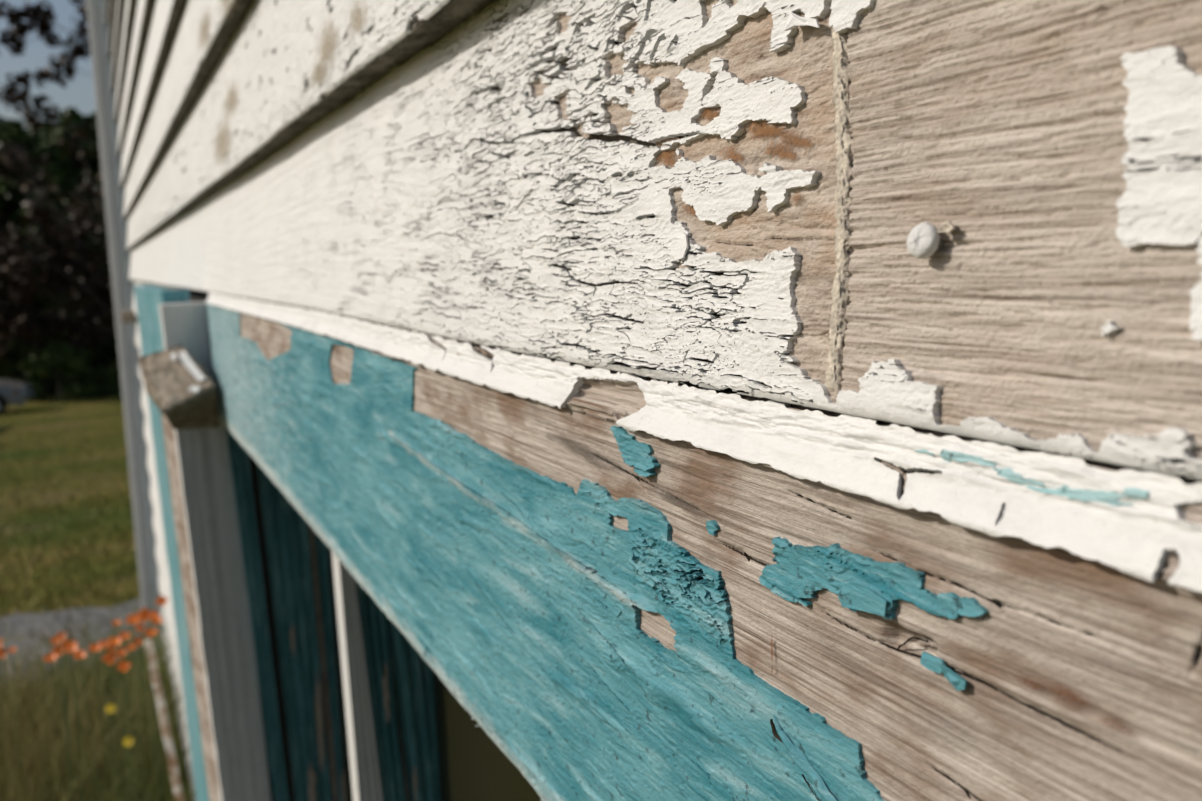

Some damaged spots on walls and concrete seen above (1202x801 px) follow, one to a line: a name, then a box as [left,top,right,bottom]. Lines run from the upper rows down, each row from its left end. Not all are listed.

peeling [467,0,1202,464]
peeling [240,312,294,360]
crack [791,491,852,520]
peeling [323,335,1202,801]
crack [1158,554,1180,579]
crack [869,548,1121,648]
crack [1194,645,1202,666]
crack [825,612,1138,761]
crack [932,767,982,801]